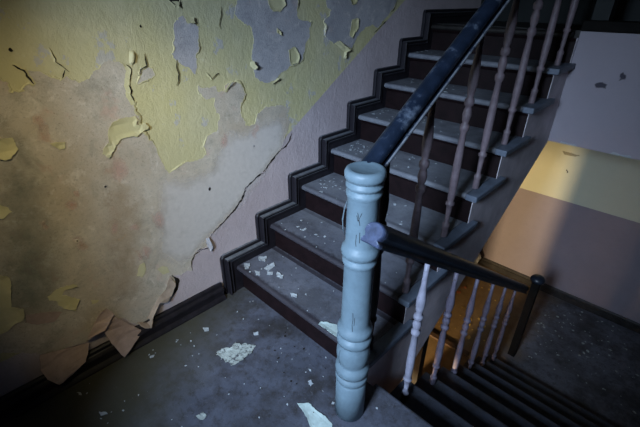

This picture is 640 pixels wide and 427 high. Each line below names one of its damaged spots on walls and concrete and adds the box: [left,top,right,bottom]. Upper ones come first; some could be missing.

peeling [171,15,201,75]
peeling [234,0,312,84]
peeling [323,0,397,59]
peeling [0,60,291,355]
water stain [163,124,281,258]
crack [191,134,292,267]